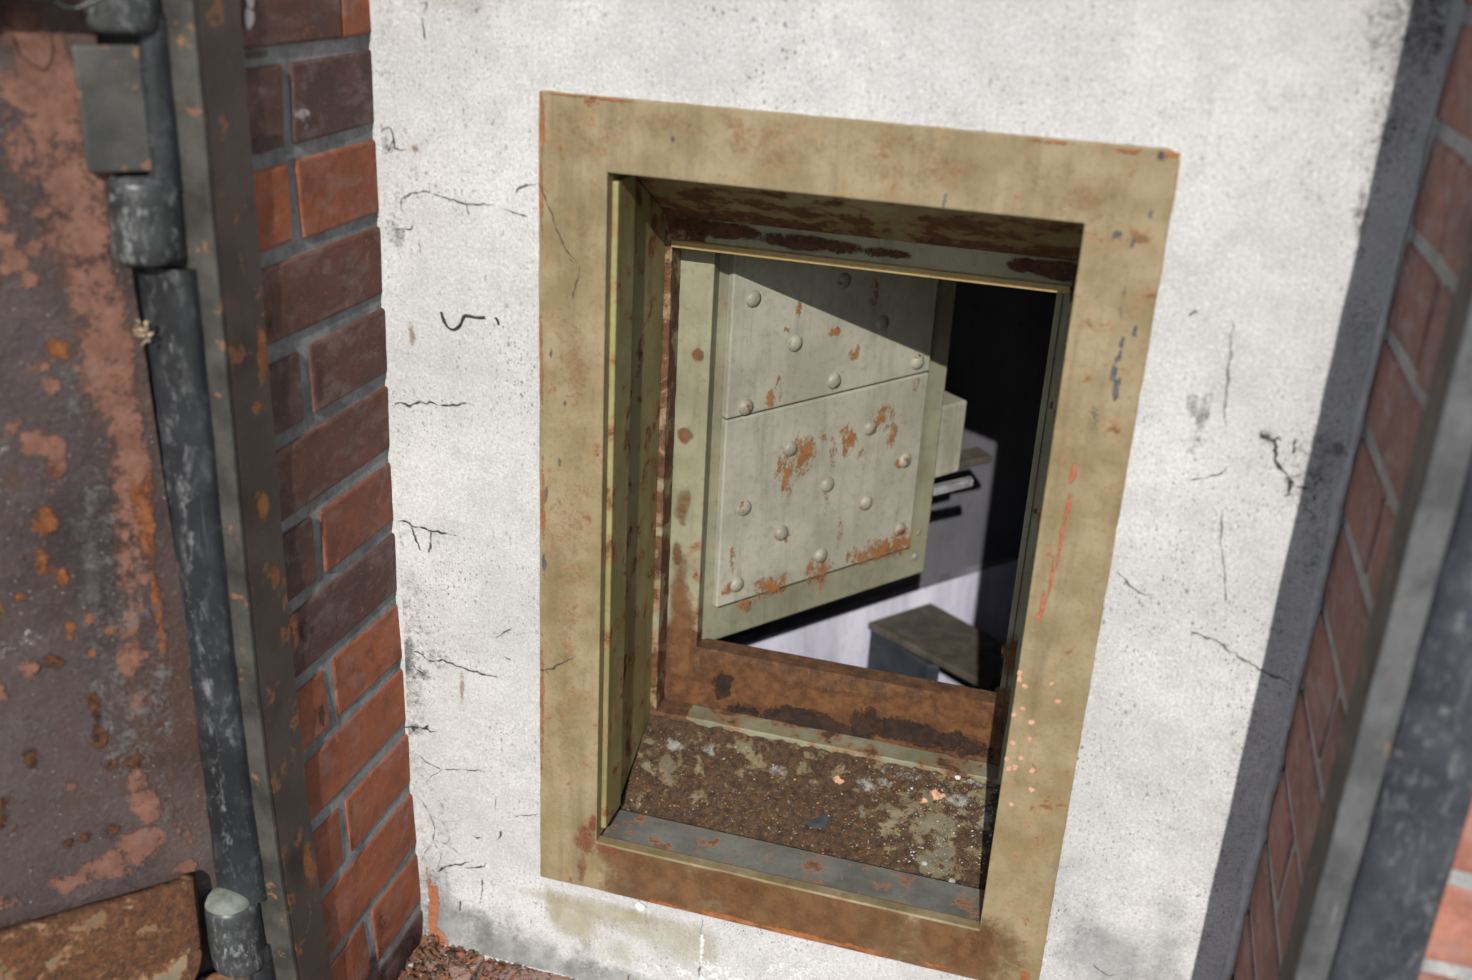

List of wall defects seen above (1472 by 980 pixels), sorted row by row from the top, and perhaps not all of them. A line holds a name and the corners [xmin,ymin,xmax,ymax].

corrosion [674,218,911,259]
corrosion [1007,257,1078,302]
corrosion [678,428,692,443]
crack [1260,431,1322,500]
crack [401,520,456,553]
crack [413,628,573,677]
corrosion [666,545,1018,761]
crack [1193,632,1289,684]
crack [404,725,531,911]
water stain [423,894,636,980]